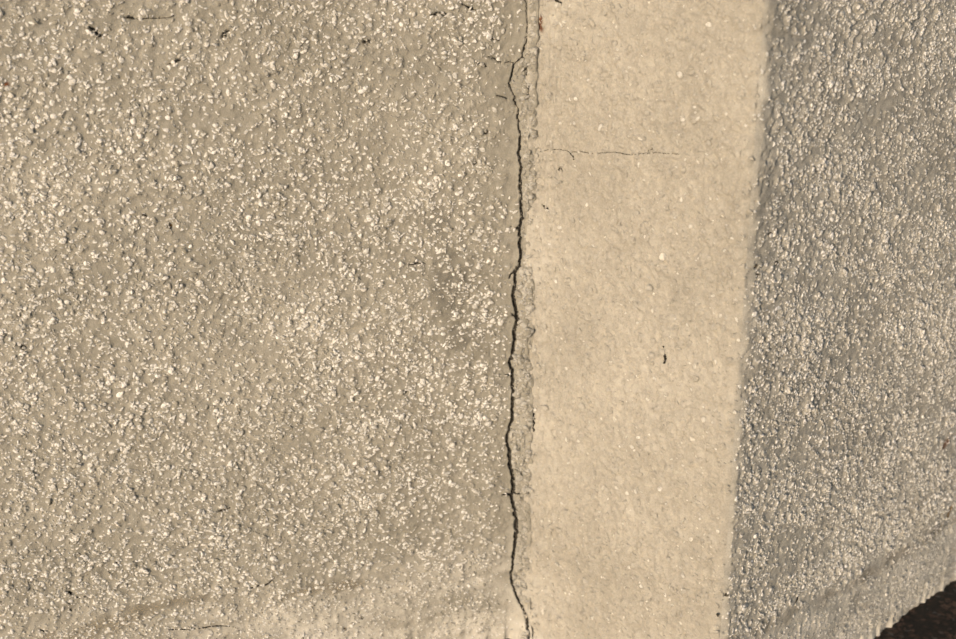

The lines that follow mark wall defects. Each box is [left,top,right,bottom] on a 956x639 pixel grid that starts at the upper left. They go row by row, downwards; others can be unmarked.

crack [478,1,674,638]